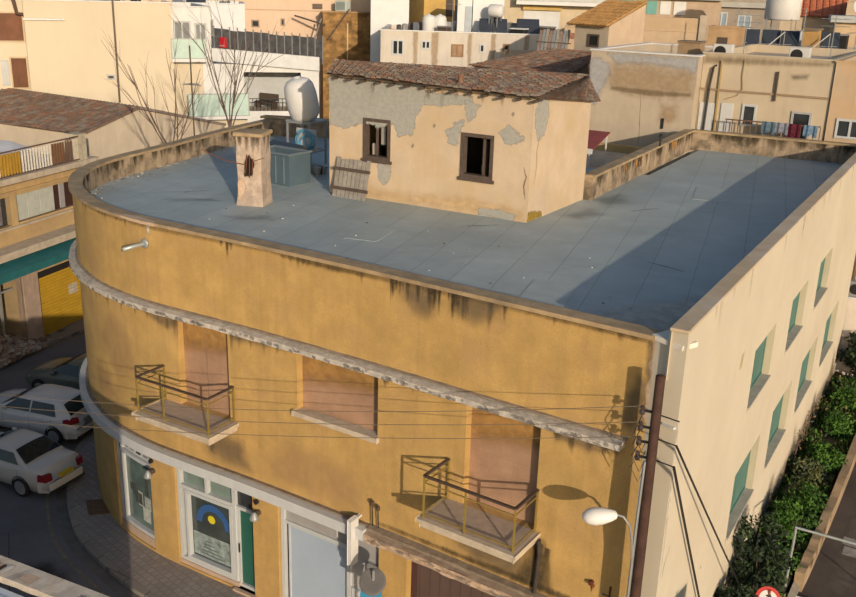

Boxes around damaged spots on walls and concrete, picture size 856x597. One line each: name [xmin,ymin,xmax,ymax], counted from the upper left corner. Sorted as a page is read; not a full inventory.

peeling [328,77,481,146]
peeling [498,125,524,146]
peeling [535,99,550,141]
peeling [377,163,391,185]
water stain [390,279,493,316]
water stain [749,363,834,542]